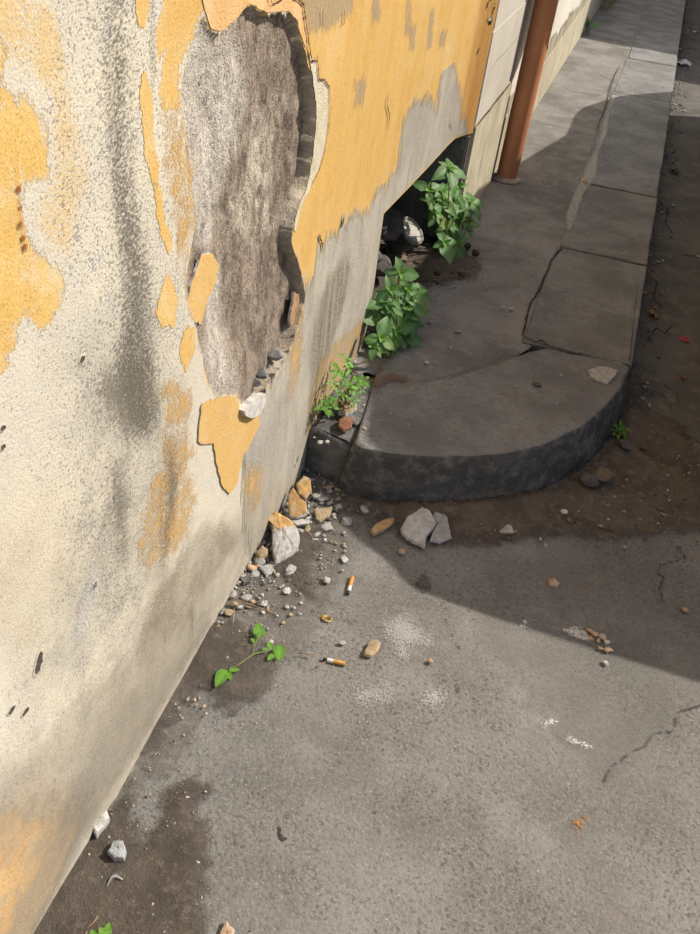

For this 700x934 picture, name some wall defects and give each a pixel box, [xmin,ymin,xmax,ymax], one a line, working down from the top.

crack [596,64,621,130]
peeling [0,0,469,934]
water stain [34,776,215,934]